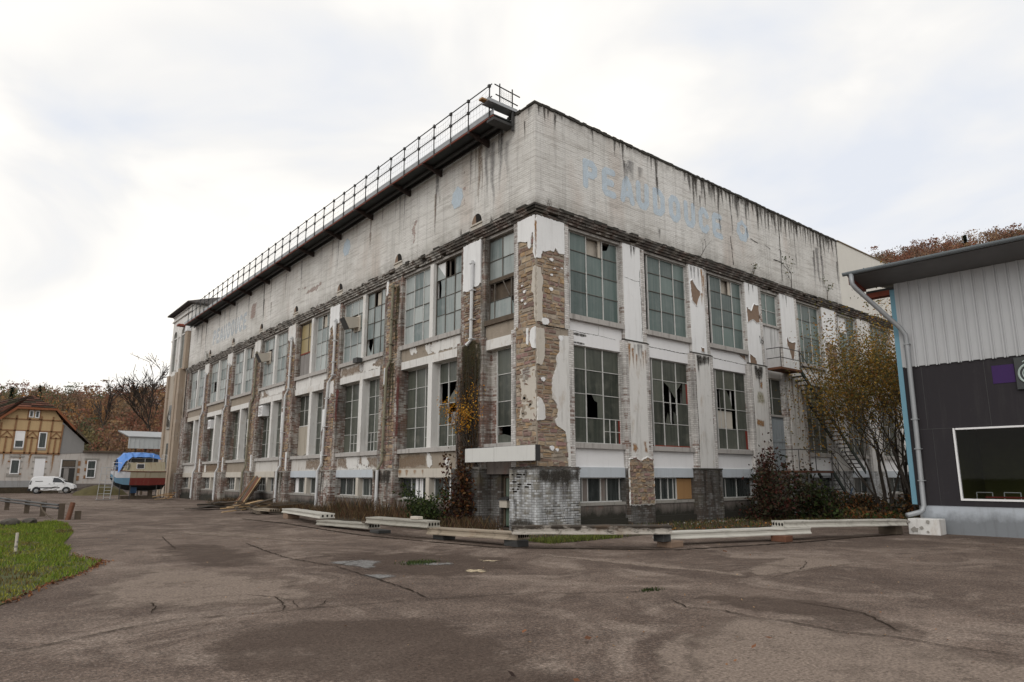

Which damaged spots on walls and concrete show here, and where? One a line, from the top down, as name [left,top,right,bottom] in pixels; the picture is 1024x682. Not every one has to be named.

leakage [684,172,838,278]
flaking render [306,239,482,470]
flaking render [511,214,571,492]
flaking render [689,279,701,307]
flaking render [746,303,760,324]
flaking render [628,456,656,506]
crack [1,519,553,653]
crack [643,534,901,578]